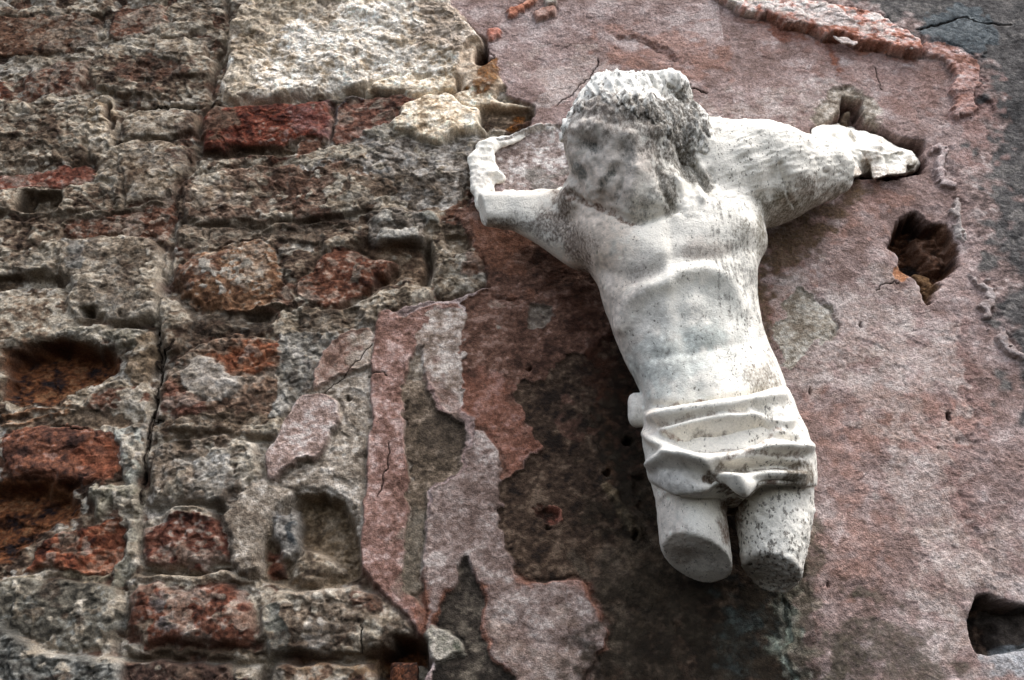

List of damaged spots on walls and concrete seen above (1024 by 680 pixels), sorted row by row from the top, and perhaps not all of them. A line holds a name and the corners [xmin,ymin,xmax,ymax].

crack [557,61,599,106]
peeling [719,0,983,119]
crack [916,17,1011,31]
crack [139,329,174,505]
crack [324,345,387,394]
spalling [159,201,801,680]